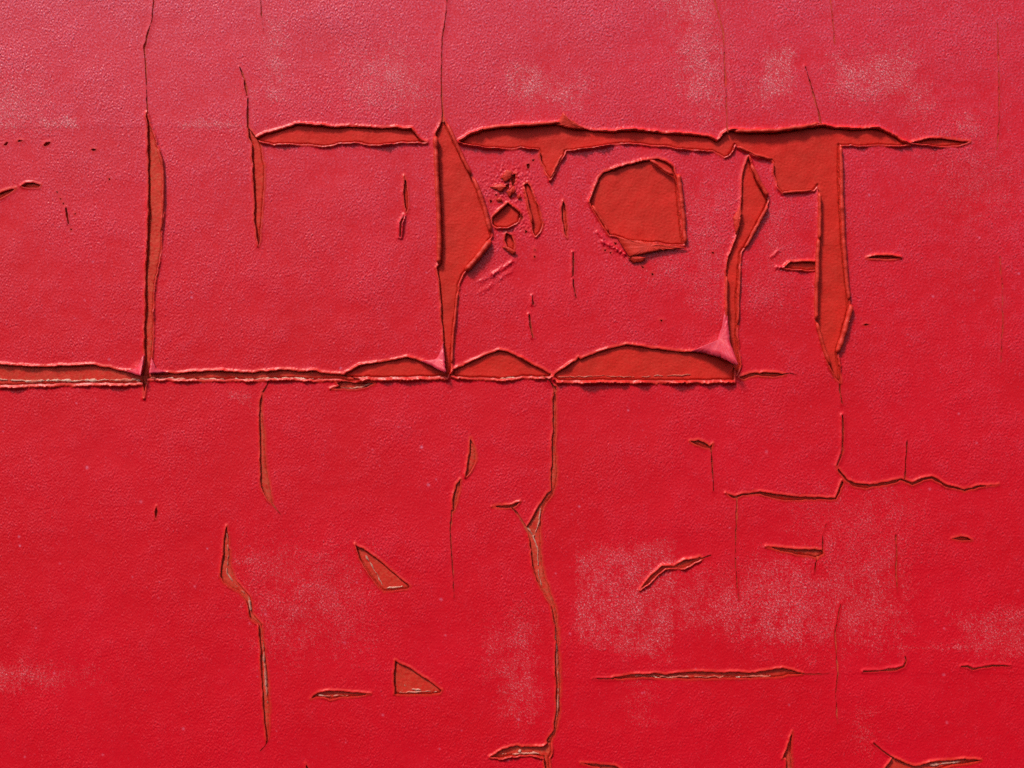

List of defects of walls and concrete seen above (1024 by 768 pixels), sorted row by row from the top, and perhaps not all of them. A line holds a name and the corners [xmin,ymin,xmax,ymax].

peeling [0,178,79,234]
peeling [125,0,171,405]
peeling [236,0,975,397]
crack [0,358,366,518]
crack [215,521,275,754]
peeling [350,538,416,597]
peeling [388,655,447,701]
crack [446,433,481,601]
crack [485,375,566,768]
crack [736,365,800,387]
crack [635,381,1003,603]